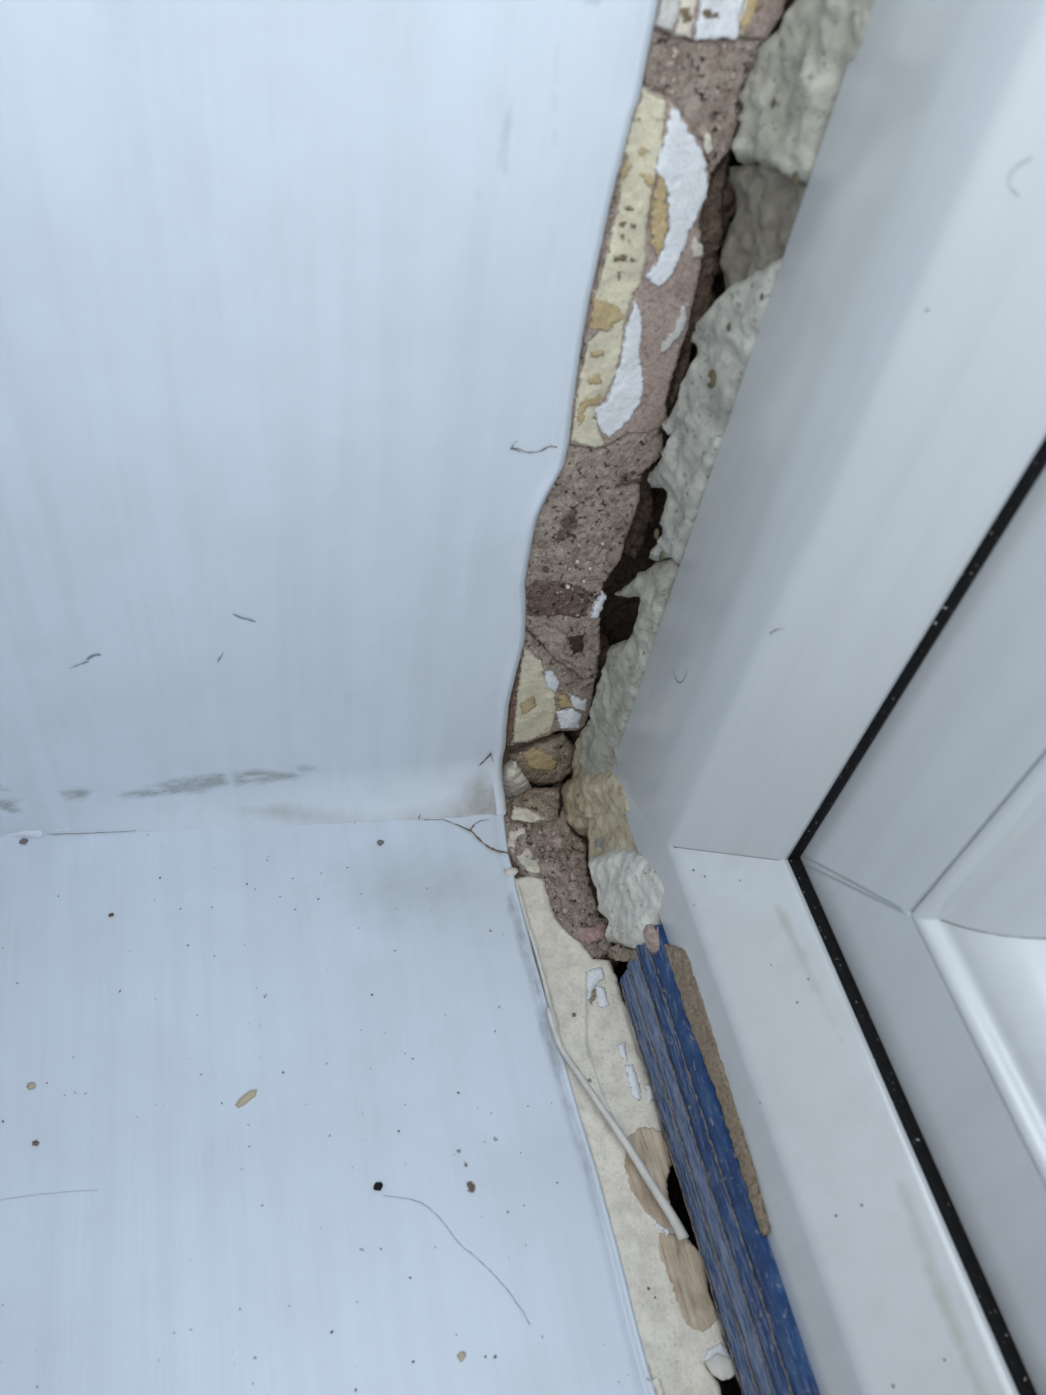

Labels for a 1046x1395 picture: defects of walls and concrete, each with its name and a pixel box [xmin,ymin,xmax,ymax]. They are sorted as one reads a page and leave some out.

peeling [506,0,787,746]
peeling [504,798,744,1395]